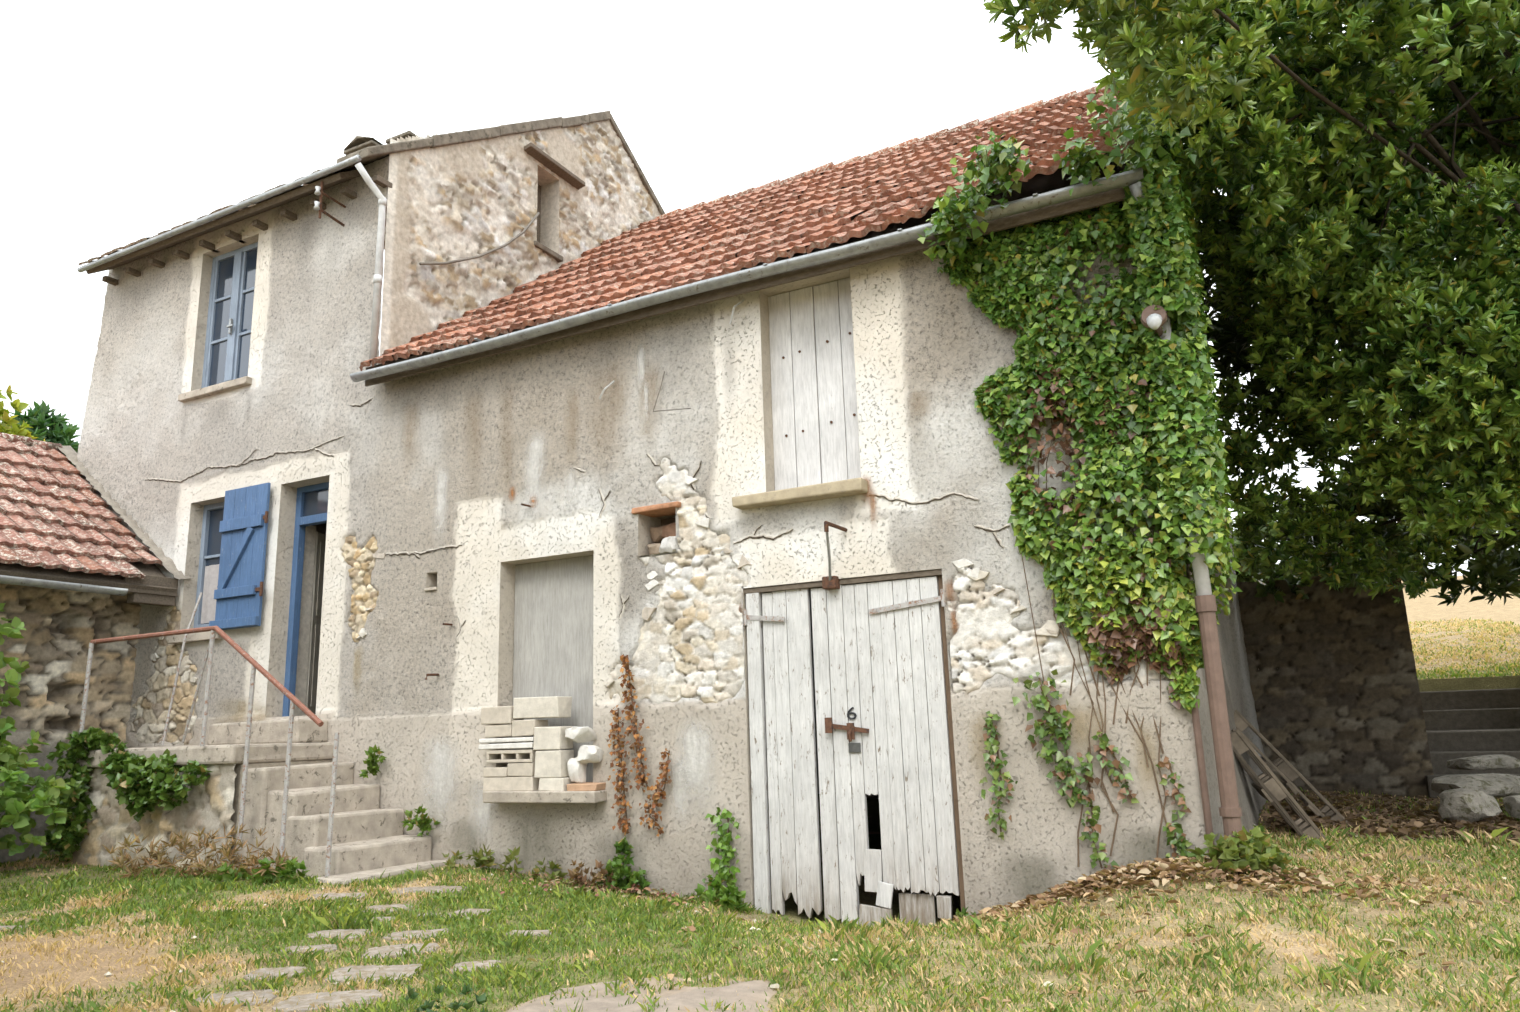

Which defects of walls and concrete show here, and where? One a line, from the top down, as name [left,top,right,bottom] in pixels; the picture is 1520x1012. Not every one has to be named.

crack [145,399,372,482]
crack [869,492,1010,548]
spalling [130,605,198,745]
spalling [341,535,385,643]
spalling [604,457,752,704]
spalling [947,558,1097,699]
spalling [1114,659,1165,684]